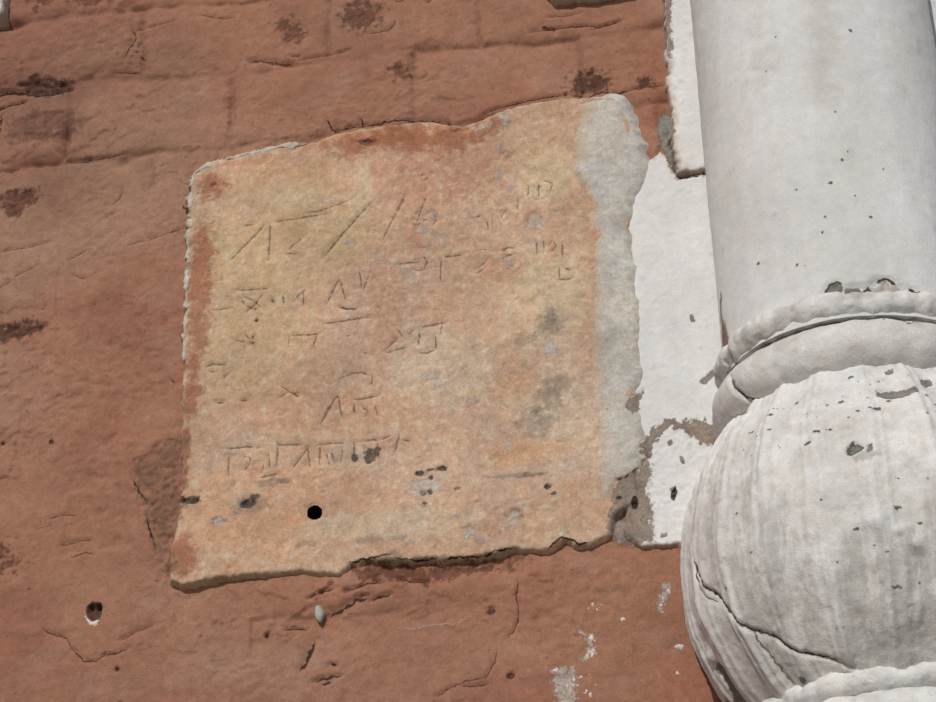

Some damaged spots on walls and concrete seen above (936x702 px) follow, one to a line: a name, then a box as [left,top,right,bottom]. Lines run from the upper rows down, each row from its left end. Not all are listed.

flaking render [824,278,896,294]
spalling [876,379,932,399]
peeling [626,391,644,412]
spalling [847,441,873,456]
spalling [605,418,716,548]
crack [694,561,854,683]